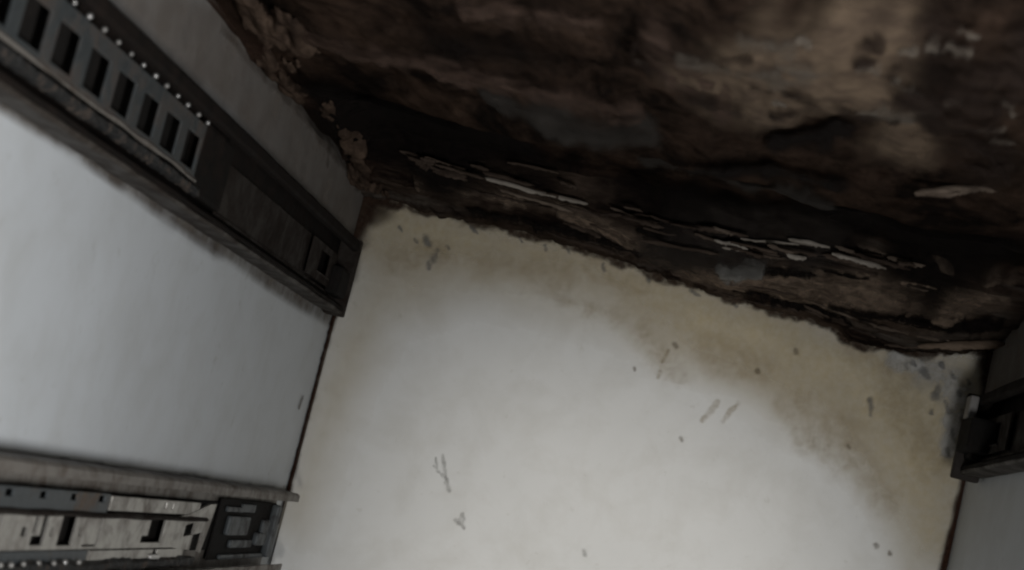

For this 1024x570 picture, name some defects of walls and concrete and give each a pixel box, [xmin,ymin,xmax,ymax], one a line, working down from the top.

leakage [207,0,284,88]
peeling [234,0,321,105]
peeling [630,0,978,167]
peeling [320,100,389,198]
leakage [301,85,549,197]
leakage [615,120,856,248]
peeling [639,204,849,283]
leakage [775,206,1023,314]
peeling [913,185,998,198]
leakage [354,196,984,549]